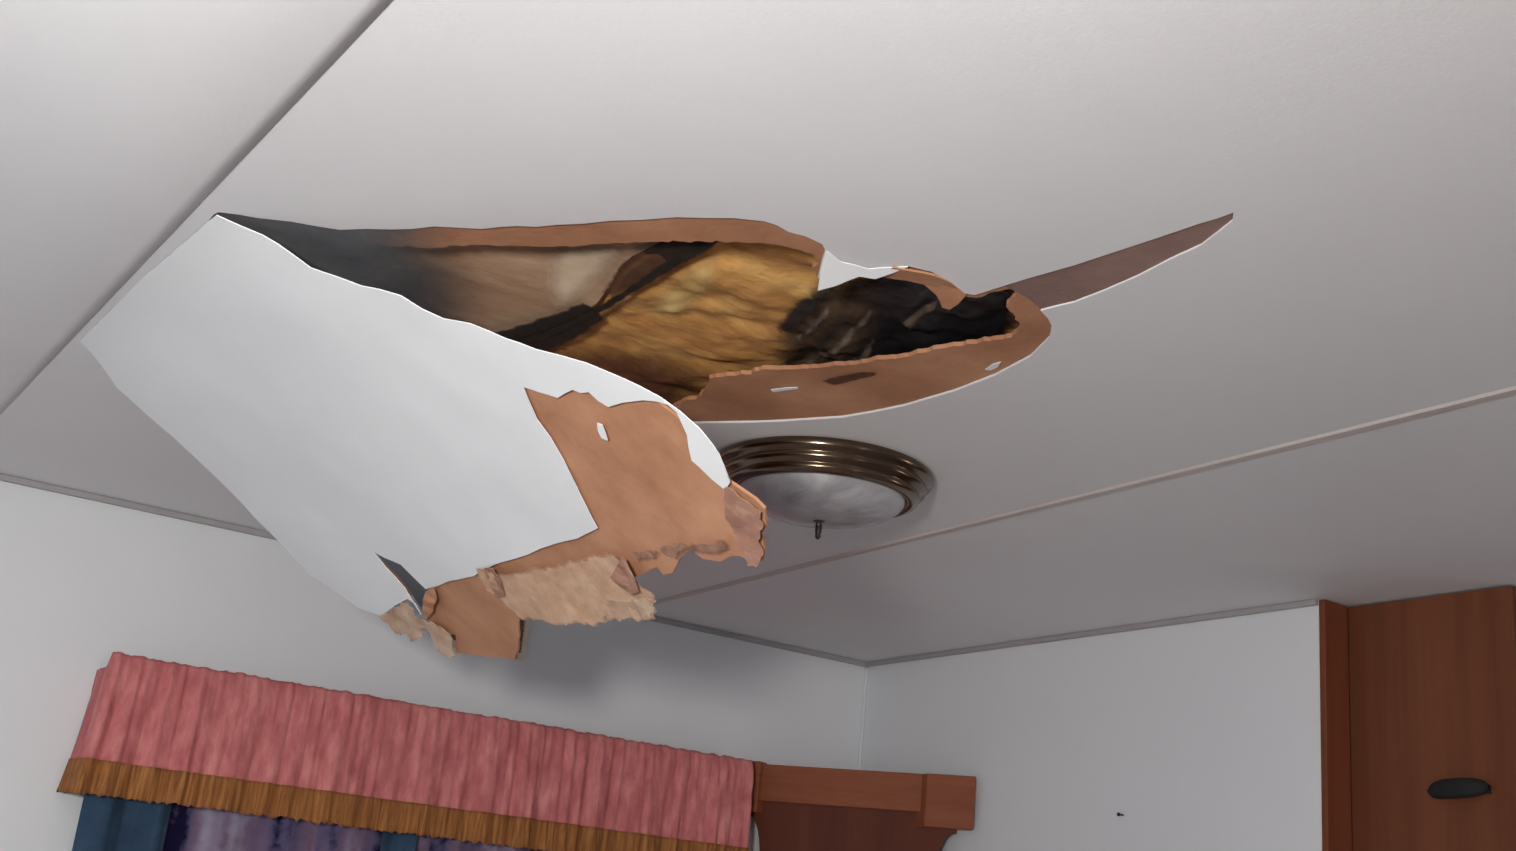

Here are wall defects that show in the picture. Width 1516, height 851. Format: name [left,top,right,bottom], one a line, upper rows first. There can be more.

leakage [210,212,452,318]
leakage [553,249,610,301]
peeling [818,251,966,310]
peeling [1005,213,1233,309]
leakage [778,277,1018,385]
leakage [573,353,699,405]
peeling [597,423,608,441]
peeling [422,587,437,619]
peeling [484,568,506,598]